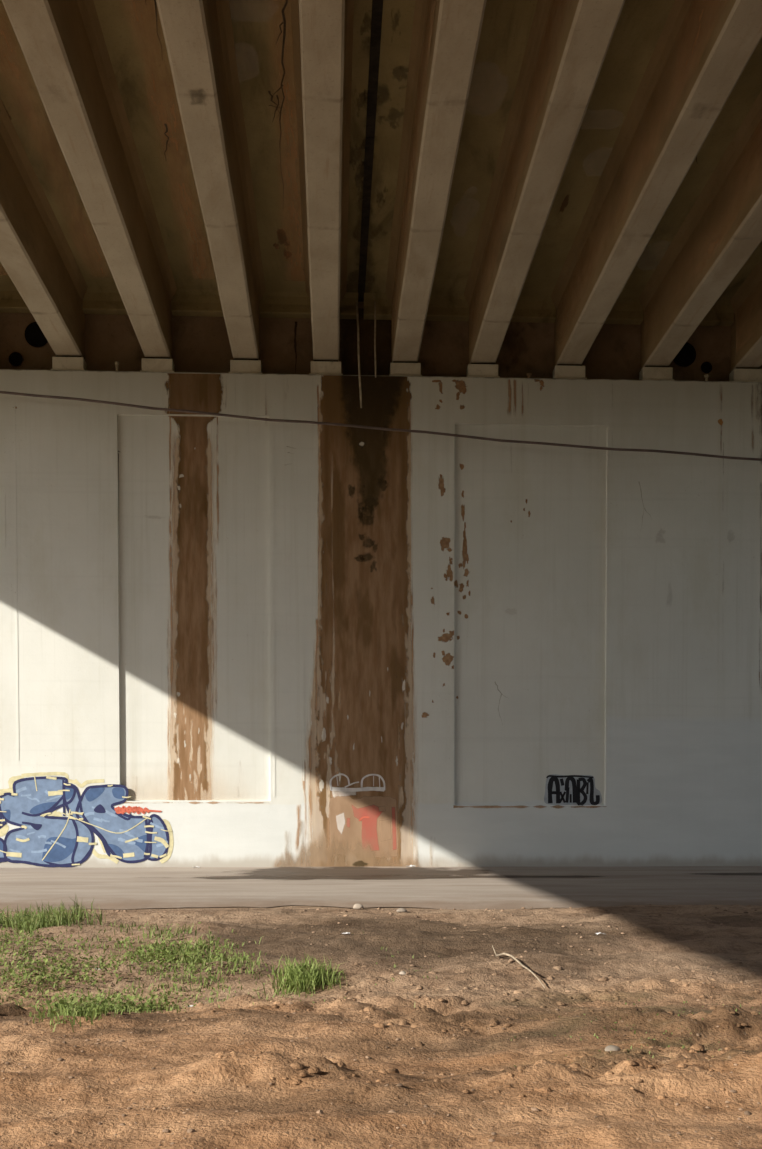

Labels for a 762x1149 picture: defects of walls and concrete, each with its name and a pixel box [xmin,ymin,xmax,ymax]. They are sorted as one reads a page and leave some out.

crack [268,0,288,194]
corrosion [164,373,223,804]
corrosion [296,375,413,865]